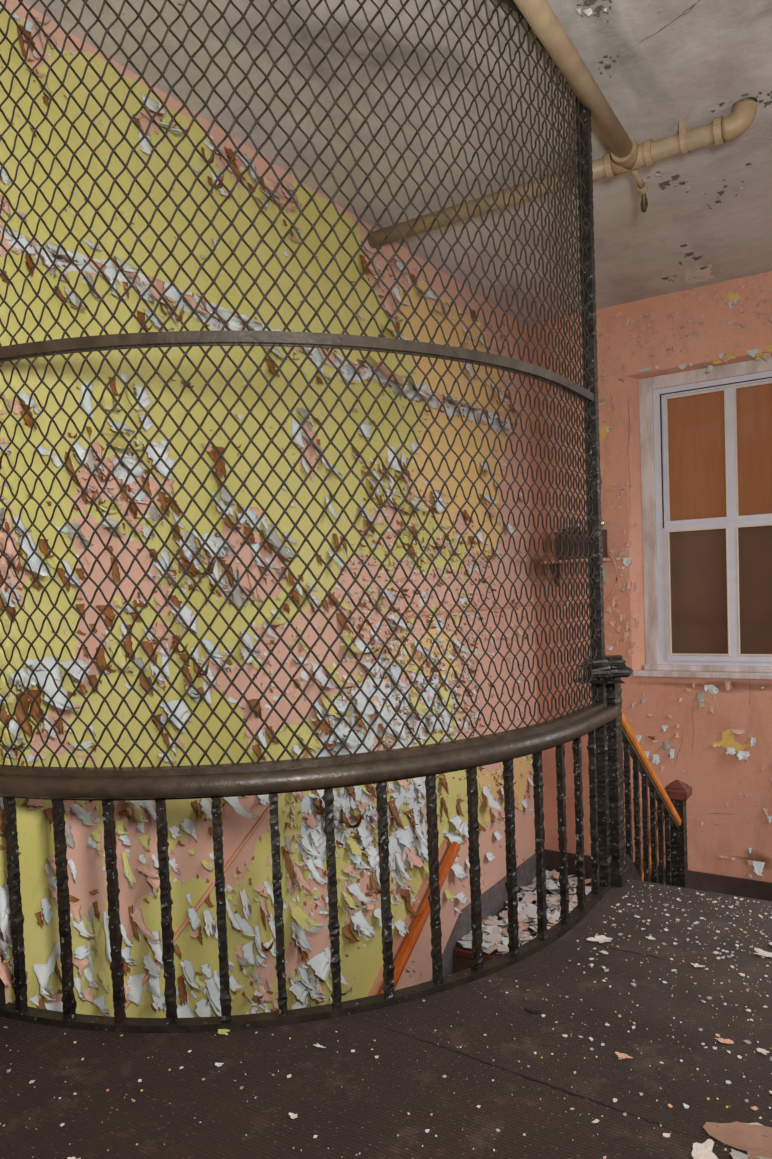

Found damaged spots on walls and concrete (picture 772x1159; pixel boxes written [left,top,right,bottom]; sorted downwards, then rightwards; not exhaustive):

flaking render [576,0,612,22]
crack [629,0,700,49]
peeling [705,344,772,373]
peeling [0,6,535,767]
peeling [685,679,738,714]
peeling [631,699,680,771]
peeling [711,729,756,762]
peeling [718,848,765,878]
peeling [0,755,544,1018]